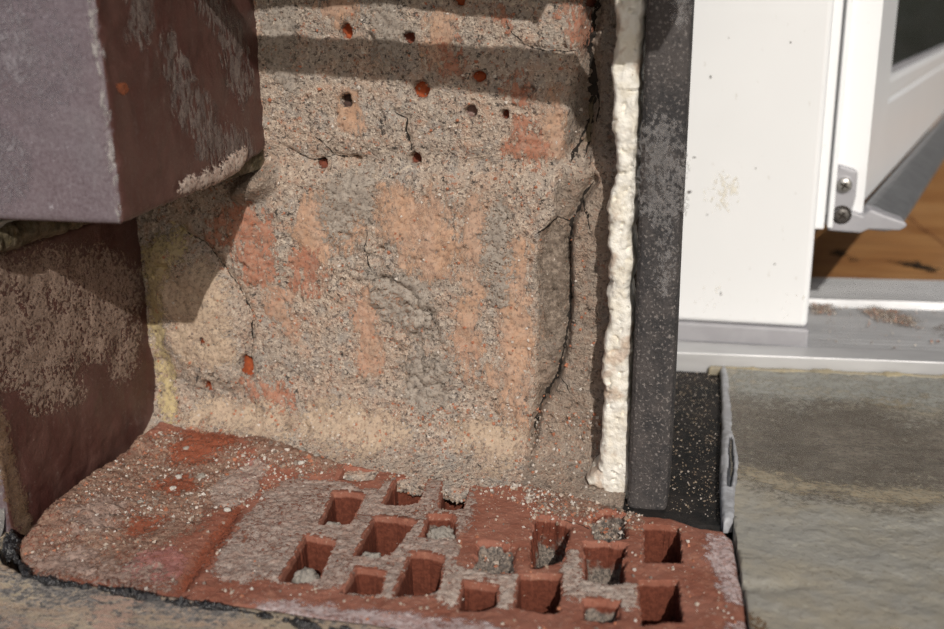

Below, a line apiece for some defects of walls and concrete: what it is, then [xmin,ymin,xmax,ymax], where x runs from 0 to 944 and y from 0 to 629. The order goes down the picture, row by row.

crack [506,0,601,163]
crack [283,137,364,160]
crack [395,112,412,150]
crack [364,224,412,291]
crack [188,232,254,359]
crack [534,180,595,431]
damp [725,366,944,513]
peeling [147,457,269,508]
peeling [52,491,174,543]